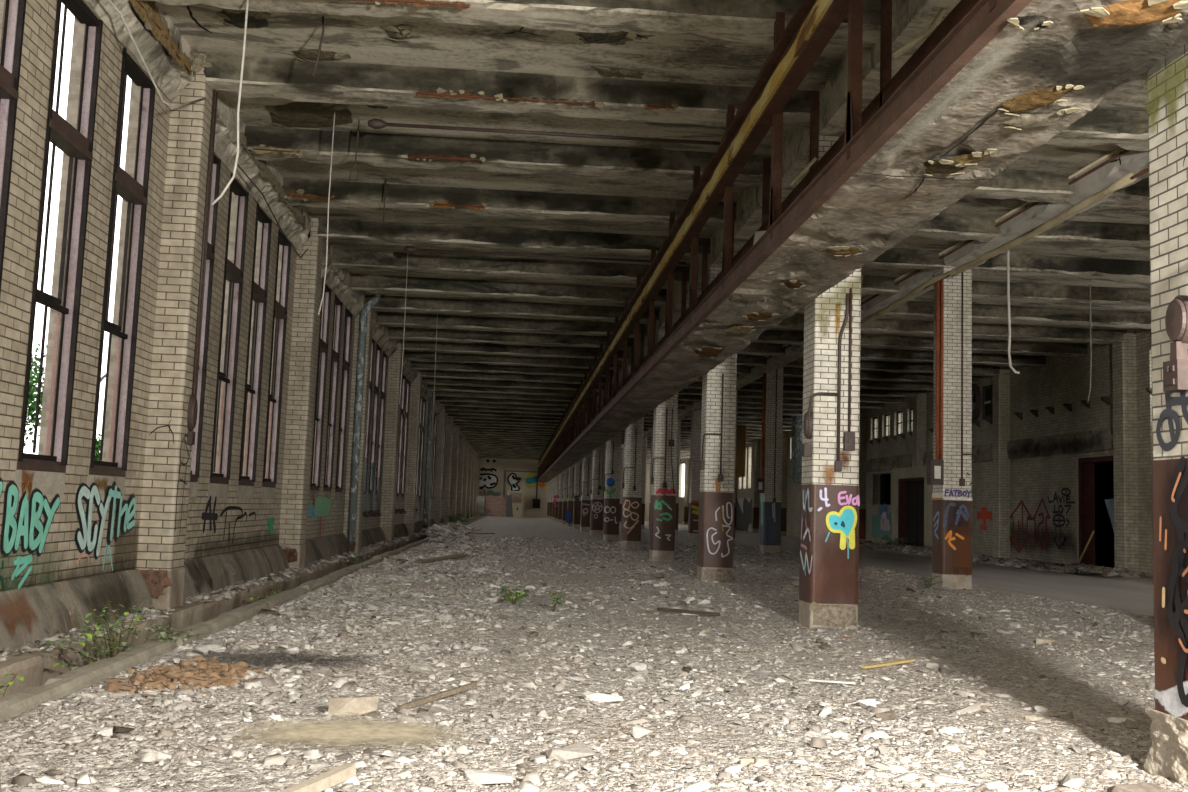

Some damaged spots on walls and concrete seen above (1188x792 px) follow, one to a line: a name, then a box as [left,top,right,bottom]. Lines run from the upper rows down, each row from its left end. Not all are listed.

spalling [1080,0,1188,27]
leakage [879,39,1015,161]
spalling [997,83,1084,131]
leakage [1017,25,1188,130]